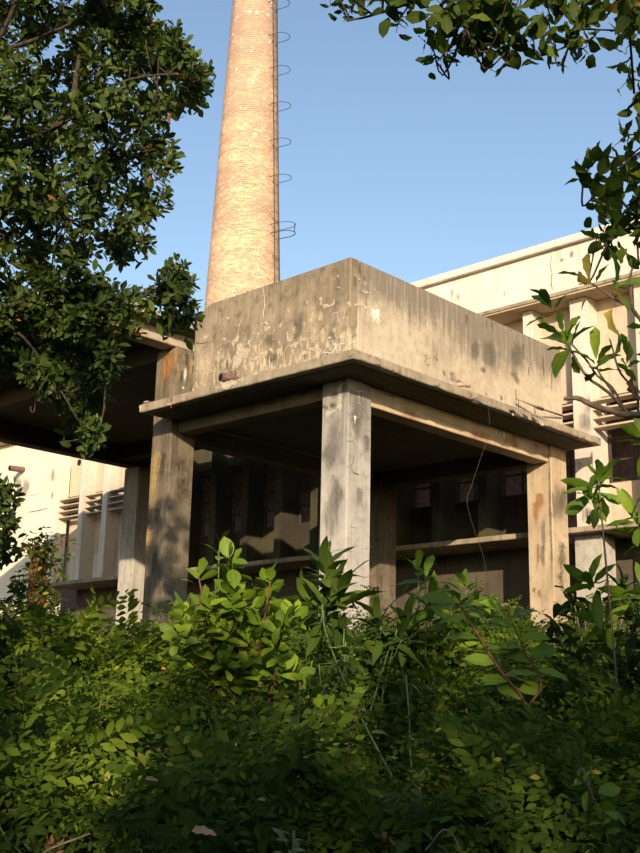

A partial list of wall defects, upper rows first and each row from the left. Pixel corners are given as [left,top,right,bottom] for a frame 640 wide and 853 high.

peeling [216,297,335,389]
corrosion [534,494,543,518]